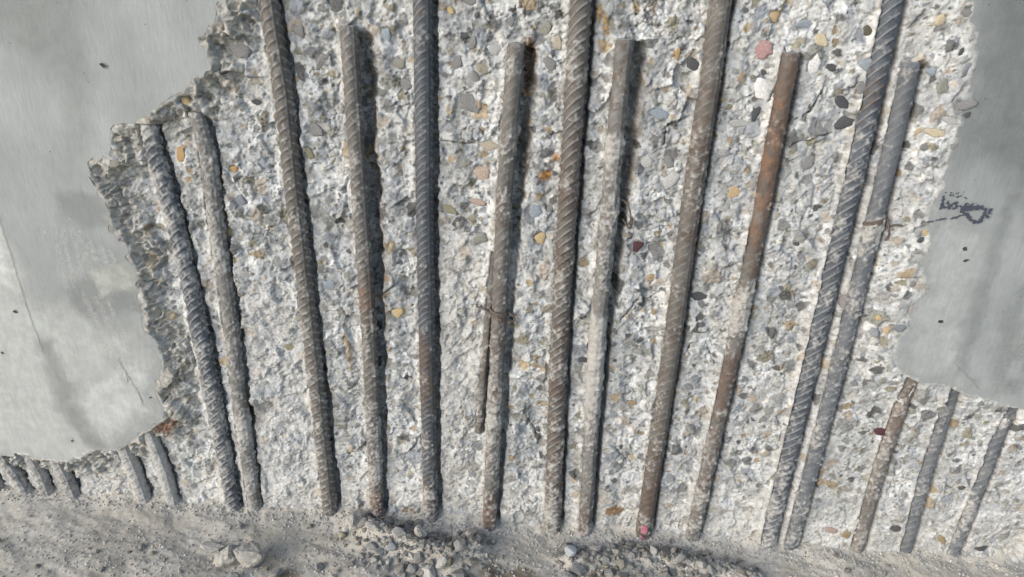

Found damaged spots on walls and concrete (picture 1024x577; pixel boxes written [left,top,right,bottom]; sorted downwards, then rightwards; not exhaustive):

spalling [0,0,570,531]
spalling [544,0,1024,564]